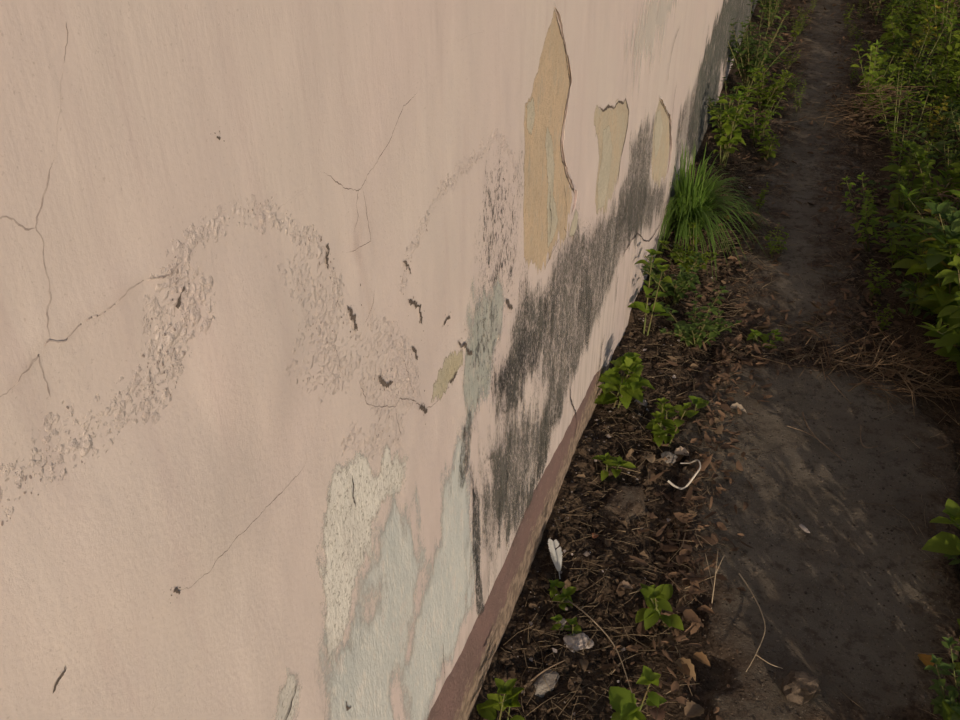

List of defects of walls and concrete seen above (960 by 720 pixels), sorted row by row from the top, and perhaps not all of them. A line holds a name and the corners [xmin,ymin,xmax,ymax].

crack [0,24,184,397]
crack [332,95,415,252]
peeling [523,3,578,271]
peeling [594,95,629,214]
peeling [651,95,672,187]
peeling [419,342,472,425]
water stain [460,115,665,617]
peeling [317,445,407,662]